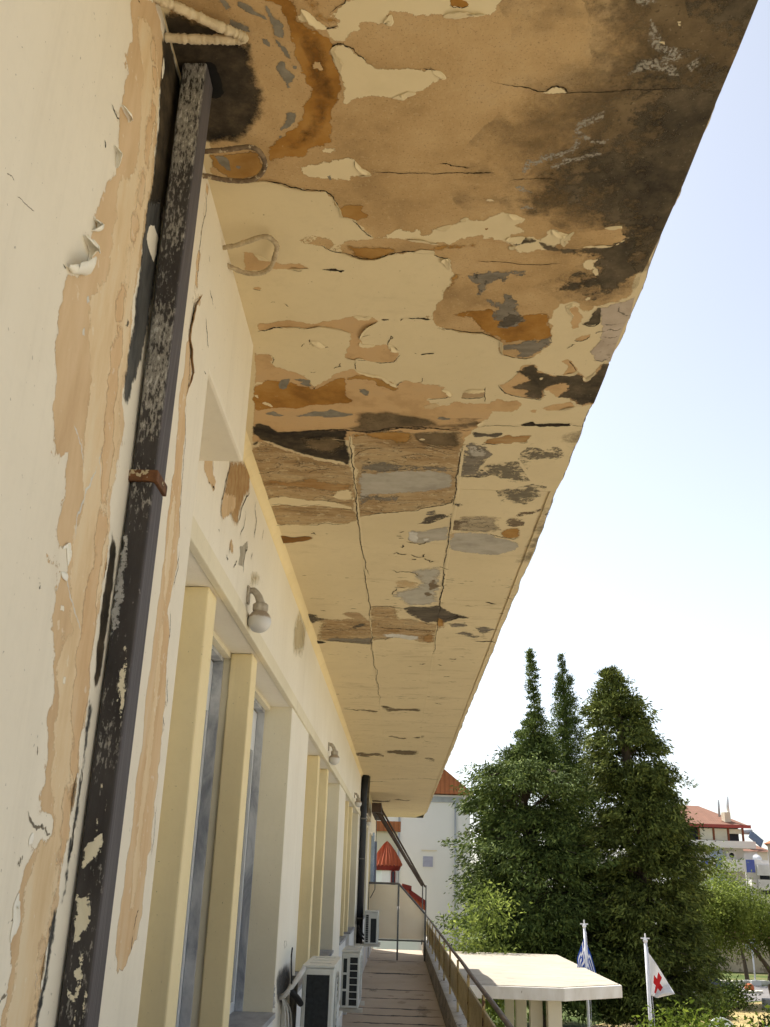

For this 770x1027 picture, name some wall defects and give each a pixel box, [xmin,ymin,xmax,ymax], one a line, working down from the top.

water stain [123,0,342,402]
crack [494,82,692,94]
water stain [514,0,758,301]
peeling [0,0,165,1027]
water stain [94,536,116,686]
peeling [115,0,665,972]
crack [349,435,489,704]
water stain [65,772,83,891]
water stain [35,911,57,1027]